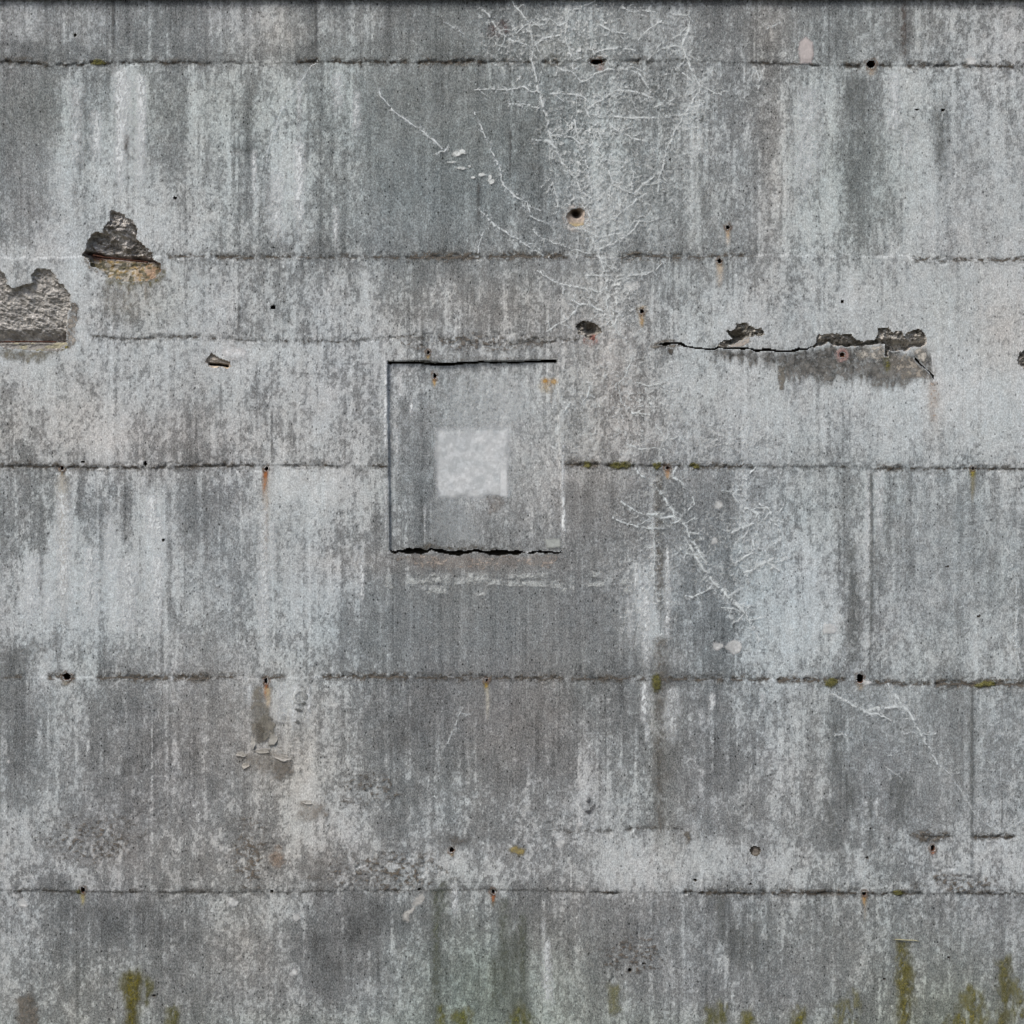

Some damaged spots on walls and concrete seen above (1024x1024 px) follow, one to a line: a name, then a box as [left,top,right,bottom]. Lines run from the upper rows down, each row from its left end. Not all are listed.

spalling [82,210,165,290]
spalling [0,268,79,363]
spalling [205,352,231,369]
crack [650,339,817,355]
spalling [714,323,932,390]
crack [390,543,562,569]